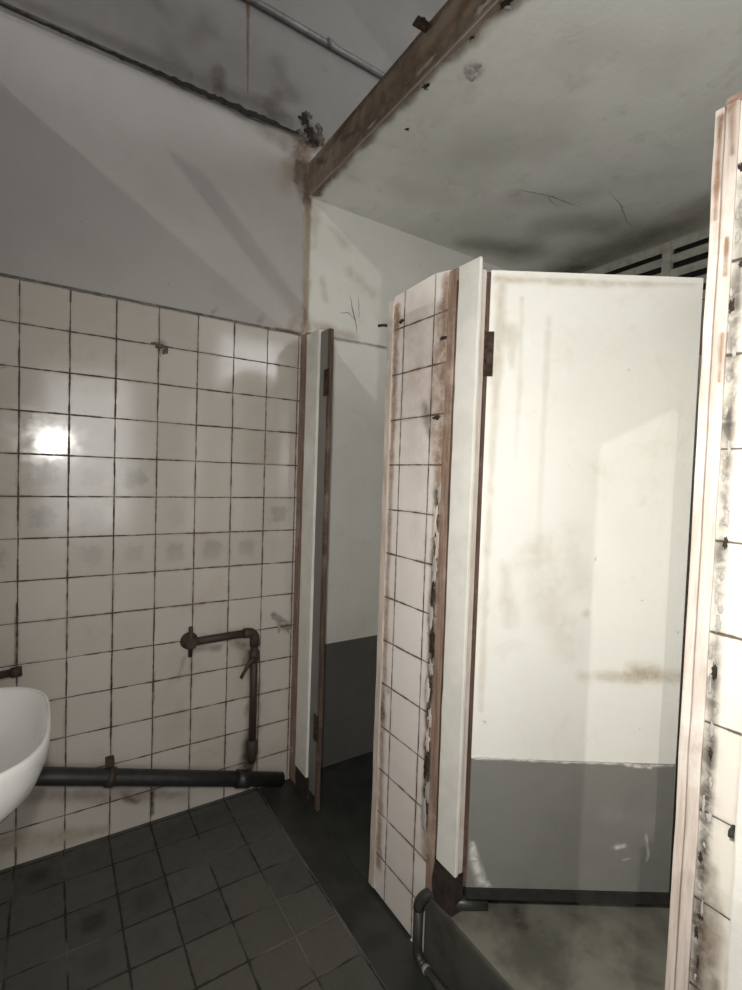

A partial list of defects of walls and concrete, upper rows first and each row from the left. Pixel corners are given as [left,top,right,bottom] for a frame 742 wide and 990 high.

corrosion [295,0,519,201]